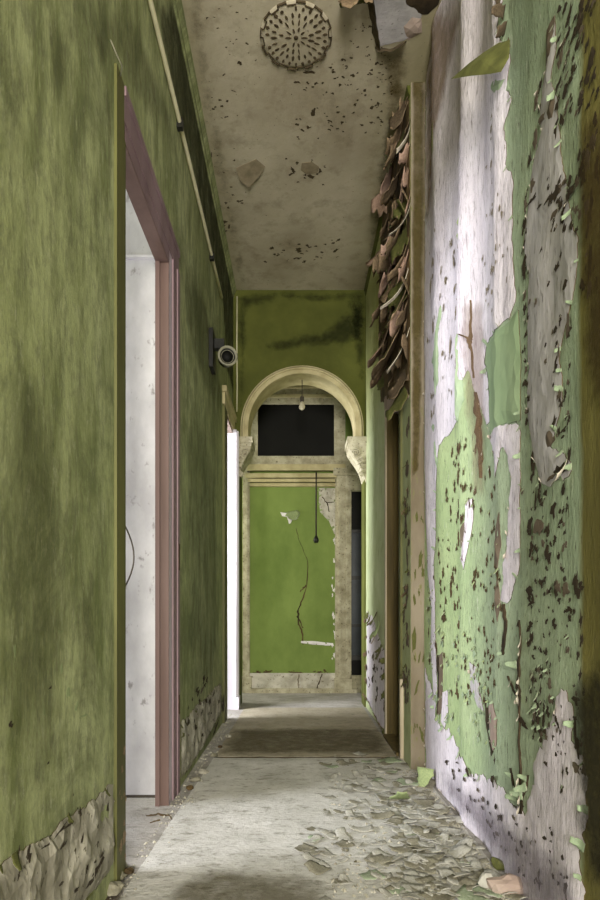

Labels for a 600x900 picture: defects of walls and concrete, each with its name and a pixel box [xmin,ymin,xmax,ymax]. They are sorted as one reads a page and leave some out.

peeling [211,148,265,209]
peeling [294,0,440,438]
peeling [398,0,600,900]
peeling [280,510,300,524]
peeling [318,488,335,544]
crack [296,529,308,644]
spalling [181,675,224,778]
spalling [0,784,127,900]